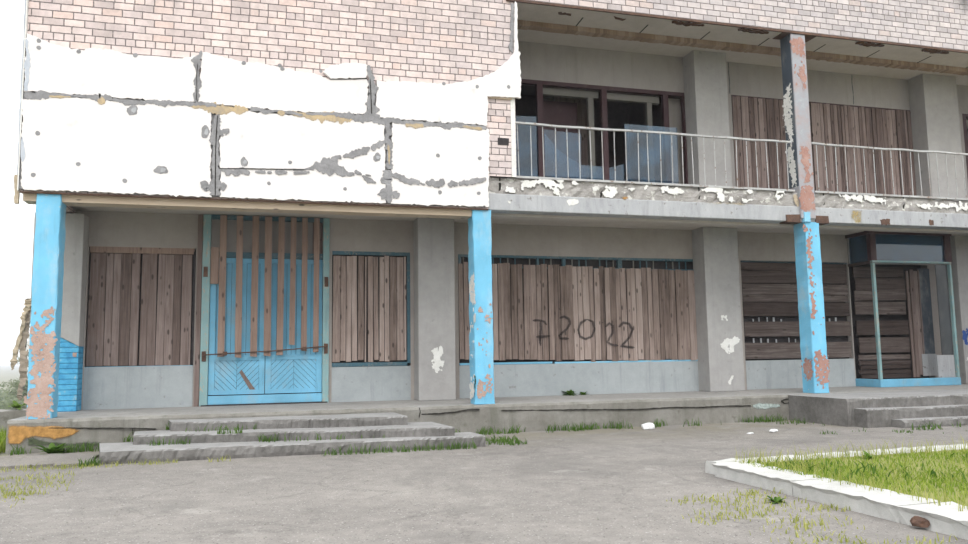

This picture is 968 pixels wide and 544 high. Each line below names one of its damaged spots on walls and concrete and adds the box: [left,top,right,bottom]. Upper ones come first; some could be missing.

peeling [775,37,816,212]
peeling [505,179,579,206]
peeling [592,185,685,198]
peeling [701,185,754,203]
peeling [839,194,888,206]
peeling [910,201,968,225]
peeling [803,224,824,335]
peeling [469,272,493,400]
spalling [720,336,740,354]
peeling [24,306,58,420]
spalling [431,346,444,373]
peeling [801,349,830,389]